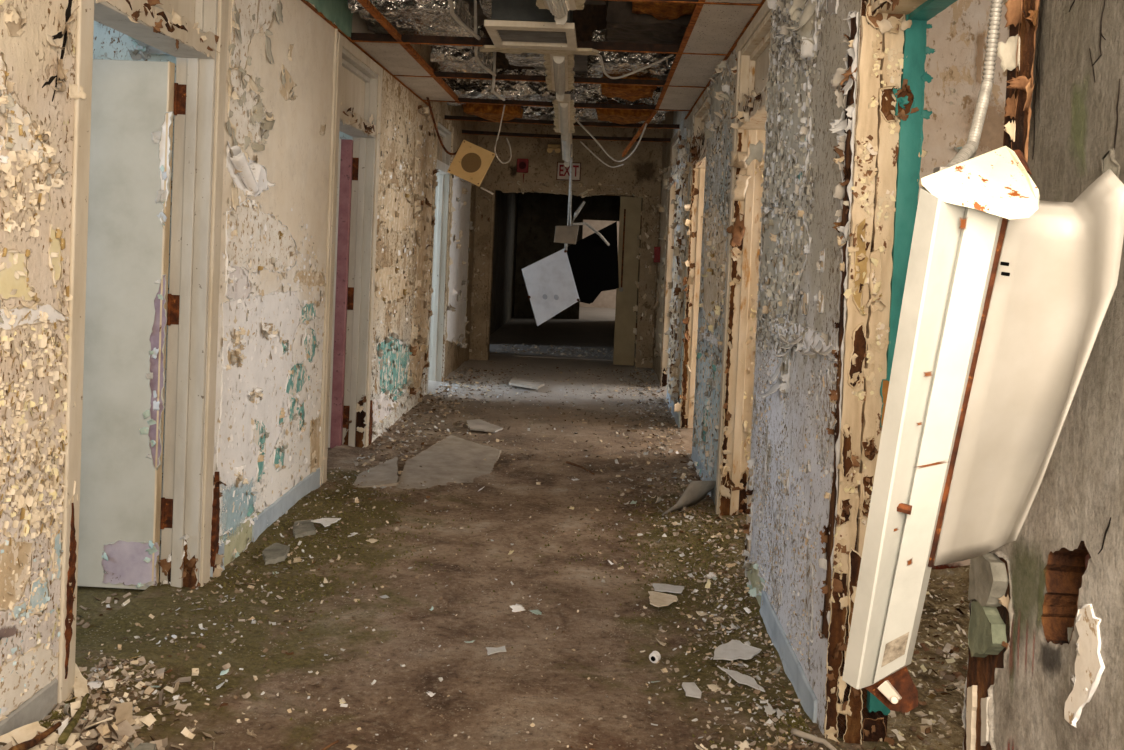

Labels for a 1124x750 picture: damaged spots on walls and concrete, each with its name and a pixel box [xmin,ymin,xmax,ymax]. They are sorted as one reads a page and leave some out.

peeling [0,0,28,38]
crack [42,0,86,102]
peeling [0,50,79,721]
peeling [96,0,326,567]
peeling [340,0,935,745]
rust [64,503,77,679]
peeling [101,534,201,590]
spalling [962,550,1016,750]
spalling [1041,541,1105,728]